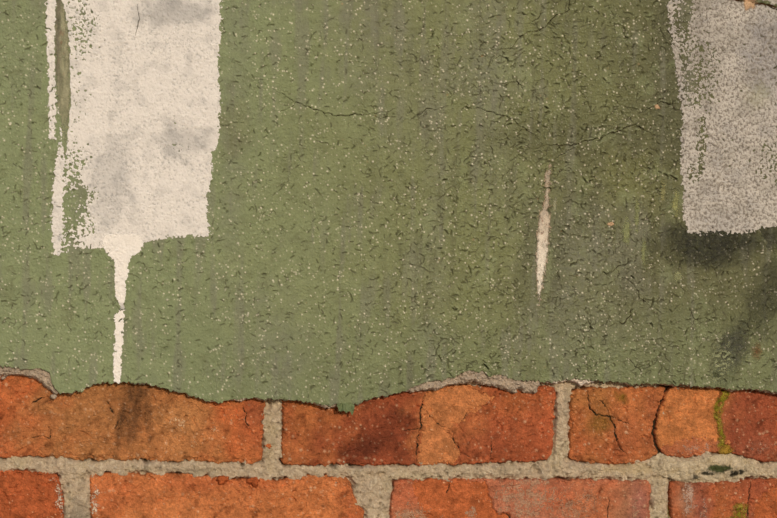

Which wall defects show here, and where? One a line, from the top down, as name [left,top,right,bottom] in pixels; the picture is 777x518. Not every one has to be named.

crack [275,90,395,119]
flaking render [0,366,58,399]
crack [406,393,489,460]
spalling [406,370,593,465]
crack [587,395,629,453]
crack [651,385,669,456]
spalling [654,350,736,450]
spalling [0,470,63,518]
spalling [412,478,510,518]